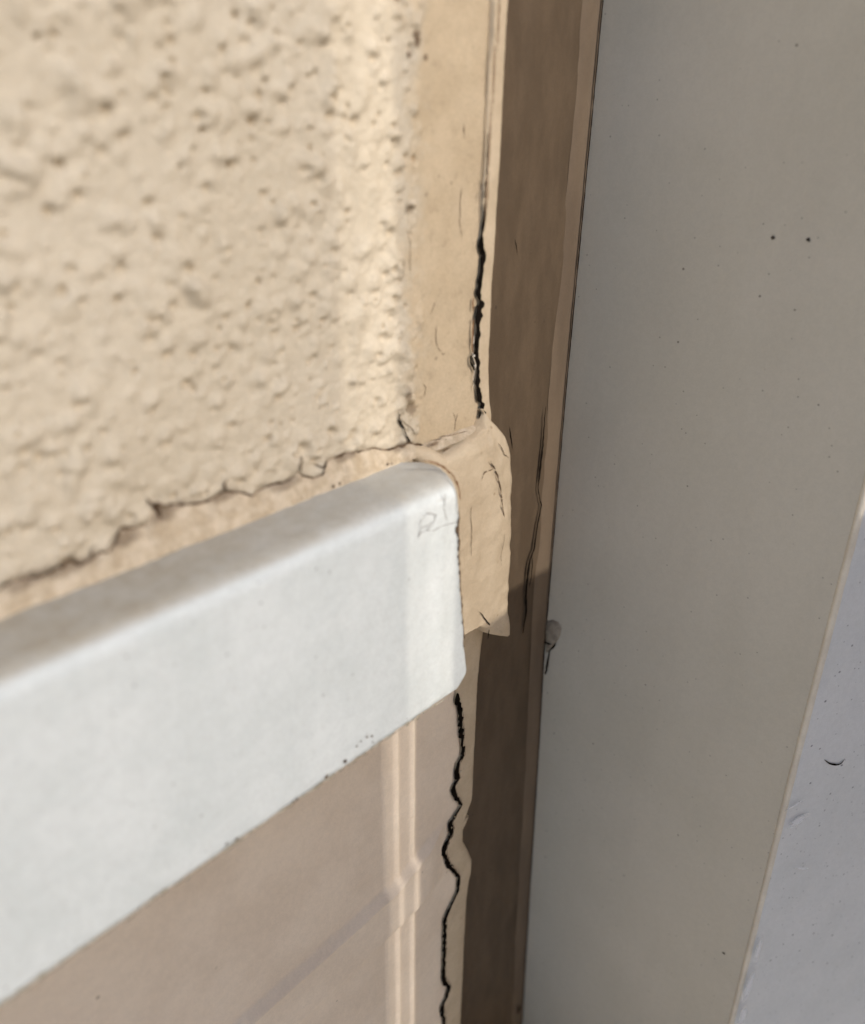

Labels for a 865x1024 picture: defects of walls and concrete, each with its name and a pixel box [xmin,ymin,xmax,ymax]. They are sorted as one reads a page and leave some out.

crack [0,125,512,638]
crack [439,693,466,1024]